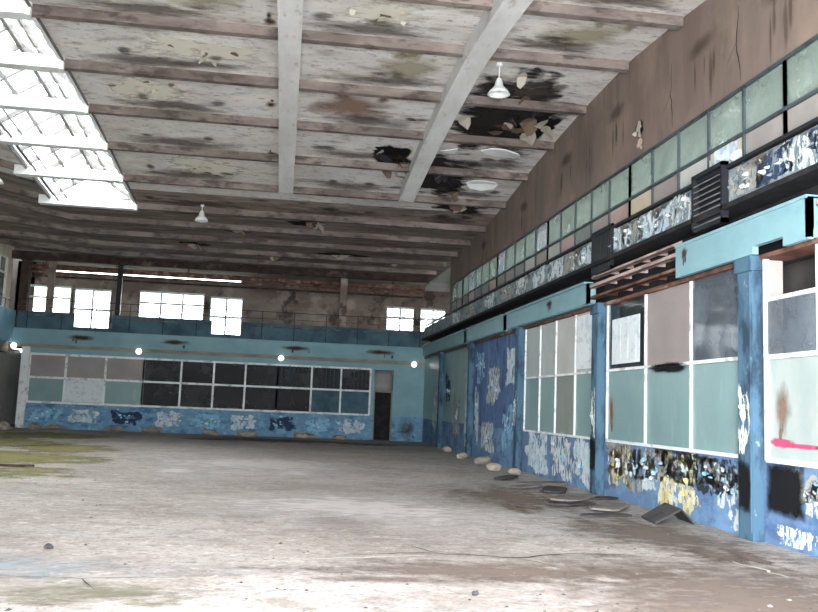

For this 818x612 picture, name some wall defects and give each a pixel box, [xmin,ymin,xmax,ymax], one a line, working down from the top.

peeling [517,68,544,89]
peeling [452,99,553,147]
peeling [376,150,403,178]
peeling [709,126,818,198]
peeling [738,385,750,454]
peeling [606,442,739,532]
peeling [795,469,818,519]
peeling [777,524,818,551]